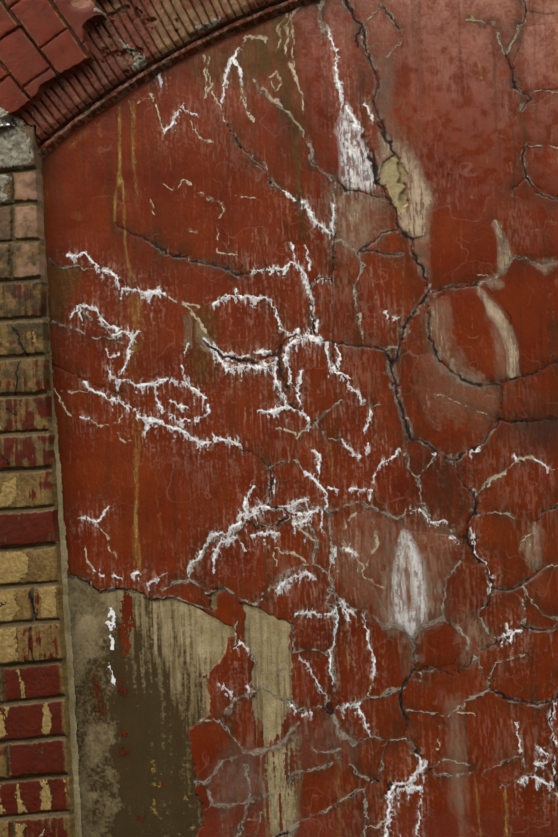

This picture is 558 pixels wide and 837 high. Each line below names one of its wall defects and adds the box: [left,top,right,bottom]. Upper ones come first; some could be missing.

water stain [317,0,373,190]
crack [343,0,403,153]
crack [465,0,558,111]
spalling [377,154,408,214]
water stain [48,252,207,333]
crack [54,388,132,443]
water stain [52,304,242,447]
water stain [279,450,338,541]
crack [67,90,558,837]
peeling [0,551,29,699]
peeling [67,574,301,837]
peeling [39,779,53,811]